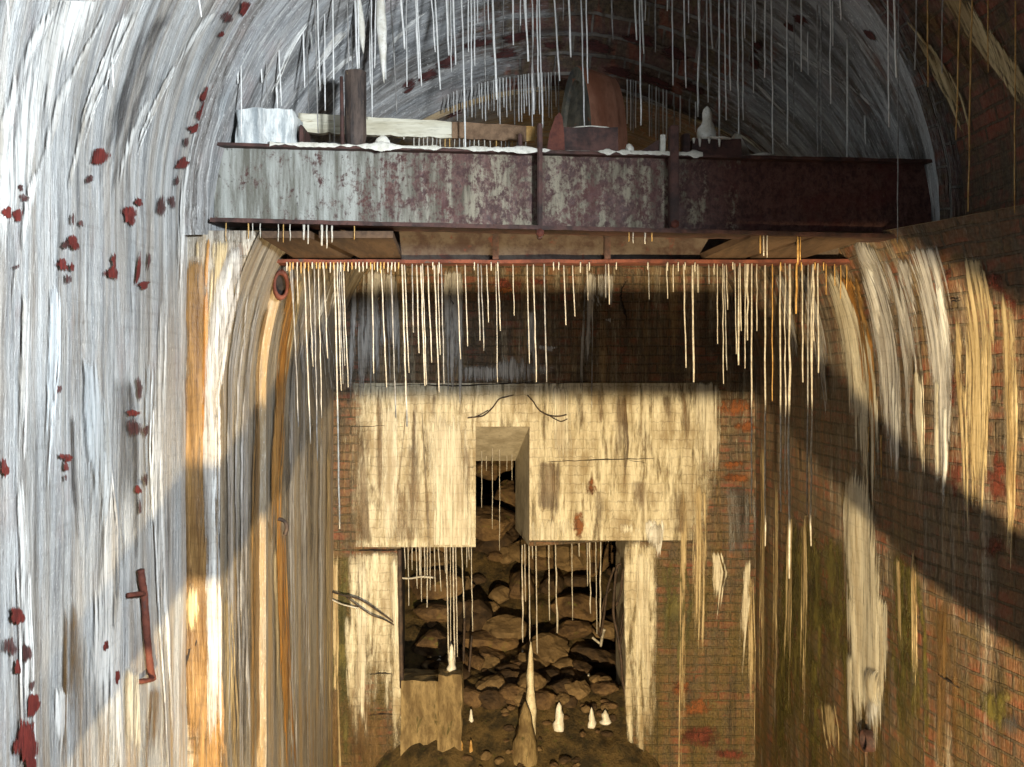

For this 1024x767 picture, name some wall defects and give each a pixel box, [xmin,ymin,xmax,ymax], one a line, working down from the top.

spalling [86,148,111,183]
spalling [157,87,209,217]
spalling [2,184,29,222]
spalling [123,197,143,226]
spalling [56,213,83,284]
spalling [103,252,118,280]
spalling [127,376,149,438]
leakage [202,248,260,767]
leakage [273,247,1018,767]
spalling [11,607,25,625]
spalling [4,637,32,674]
spalling [14,681,41,767]